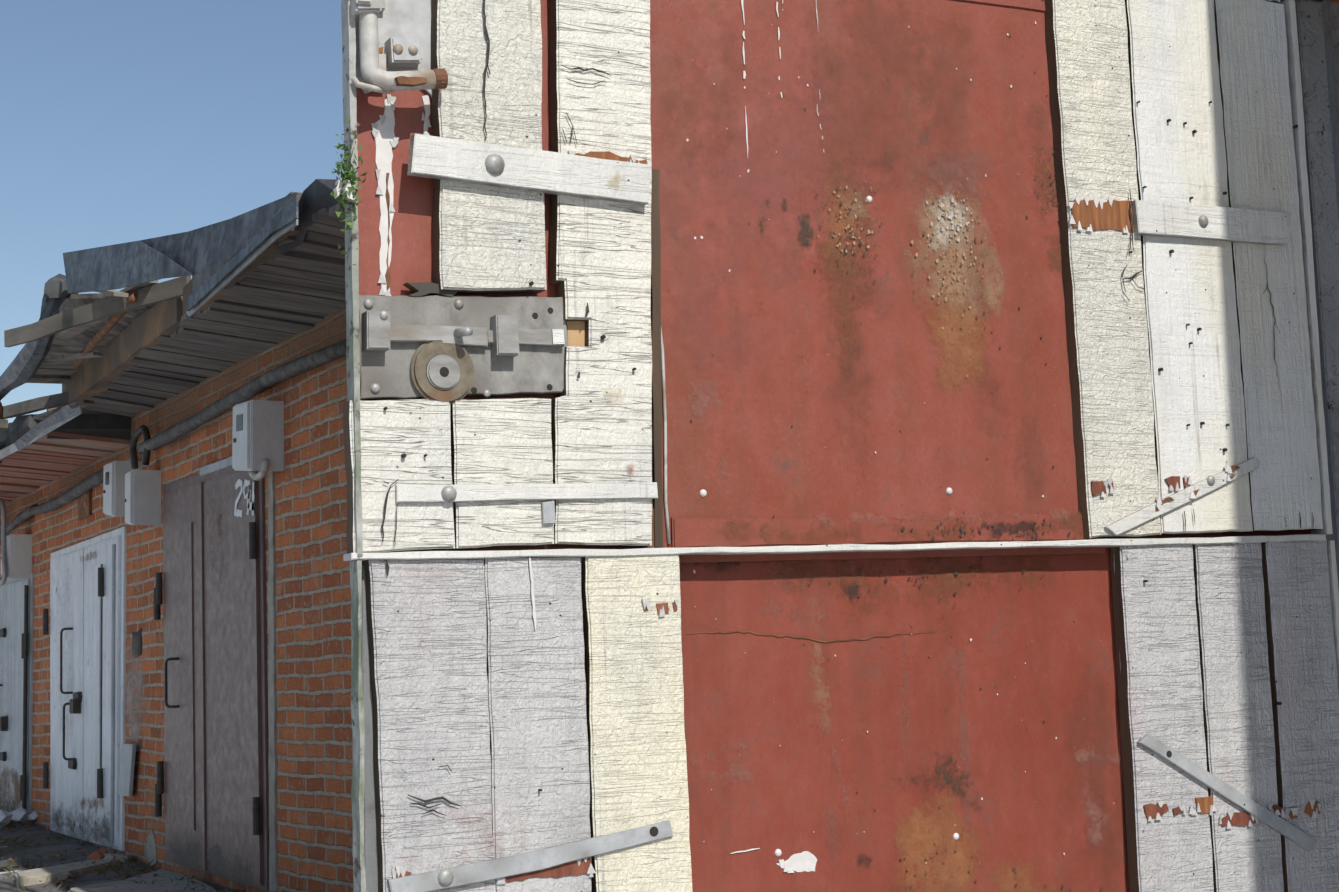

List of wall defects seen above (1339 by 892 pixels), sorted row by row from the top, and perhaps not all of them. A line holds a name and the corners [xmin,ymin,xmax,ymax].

crack [483,0,491,141]
peeling [371,94,399,296]
peeling [1068,197,1113,232]
peeling [1143,796,1321,829]